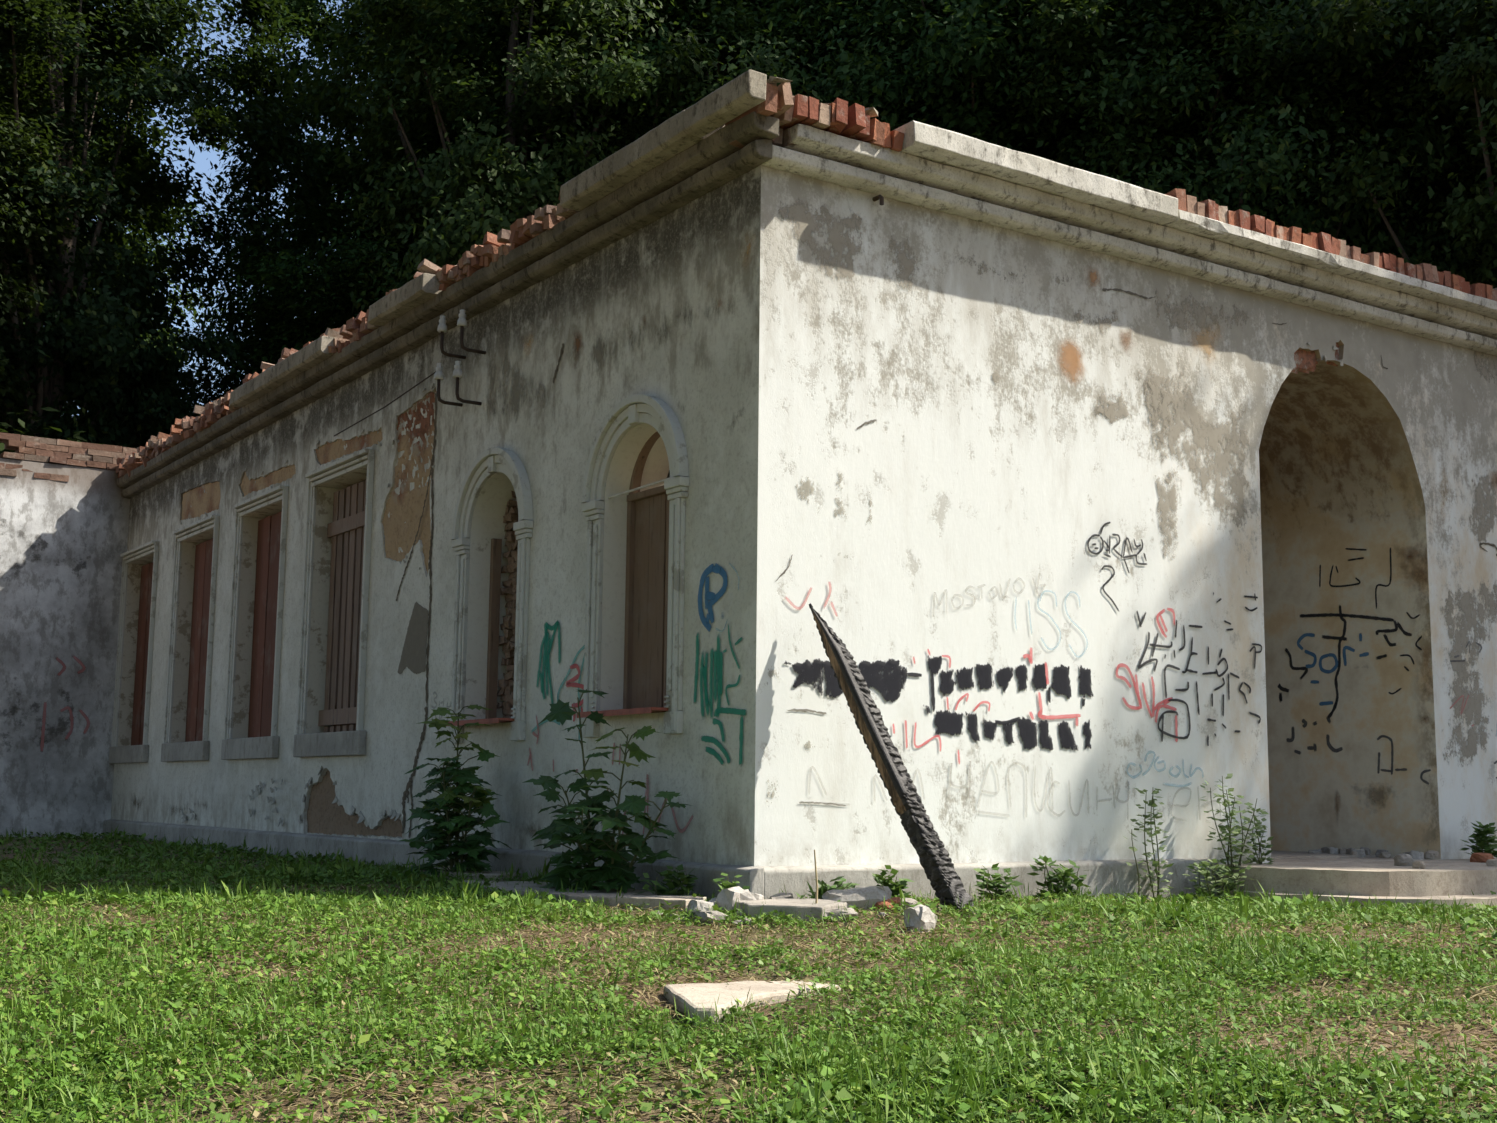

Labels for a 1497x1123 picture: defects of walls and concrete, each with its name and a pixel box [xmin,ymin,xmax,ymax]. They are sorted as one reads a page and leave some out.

rust [1061,343,1082,381]
crack [396,394,437,838]